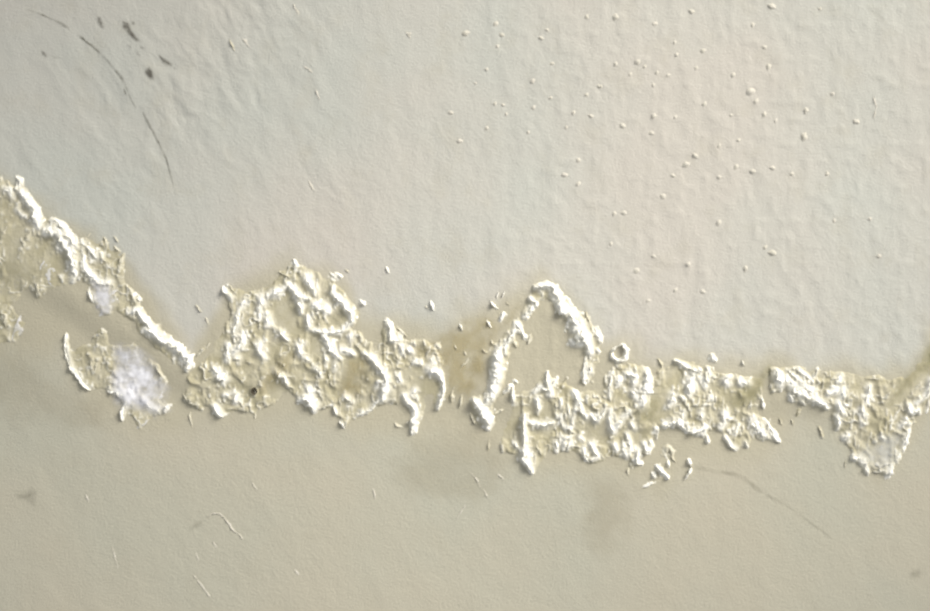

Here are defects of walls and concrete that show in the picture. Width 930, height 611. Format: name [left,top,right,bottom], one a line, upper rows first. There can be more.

flaking render [0,175,930,487]